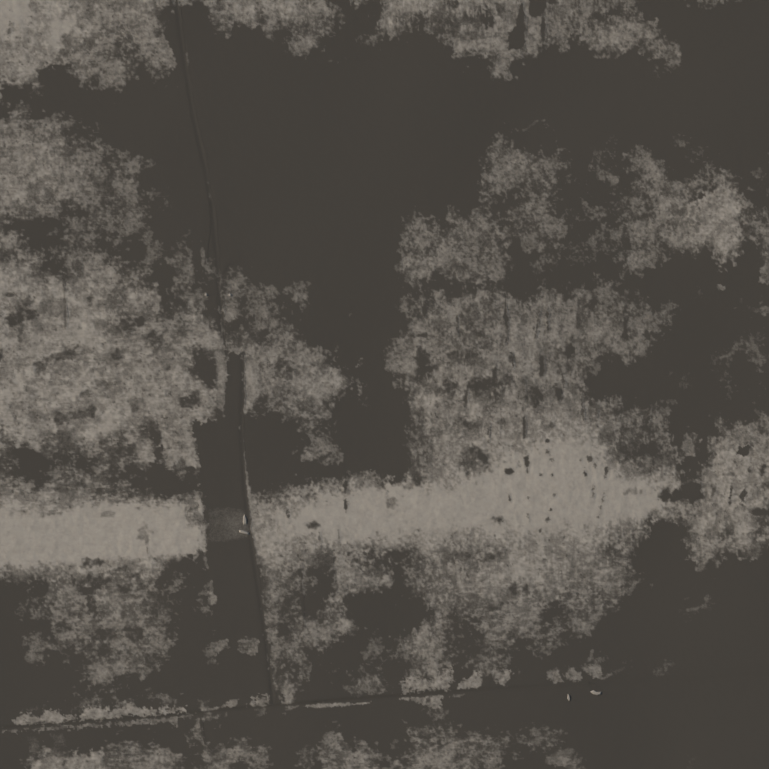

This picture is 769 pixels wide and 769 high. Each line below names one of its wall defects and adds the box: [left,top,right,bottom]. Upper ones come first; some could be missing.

leakage [0,0,769,505]
crack [0,310,769,756]
leakage [0,517,769,769]
leakage [752,503,769,536]